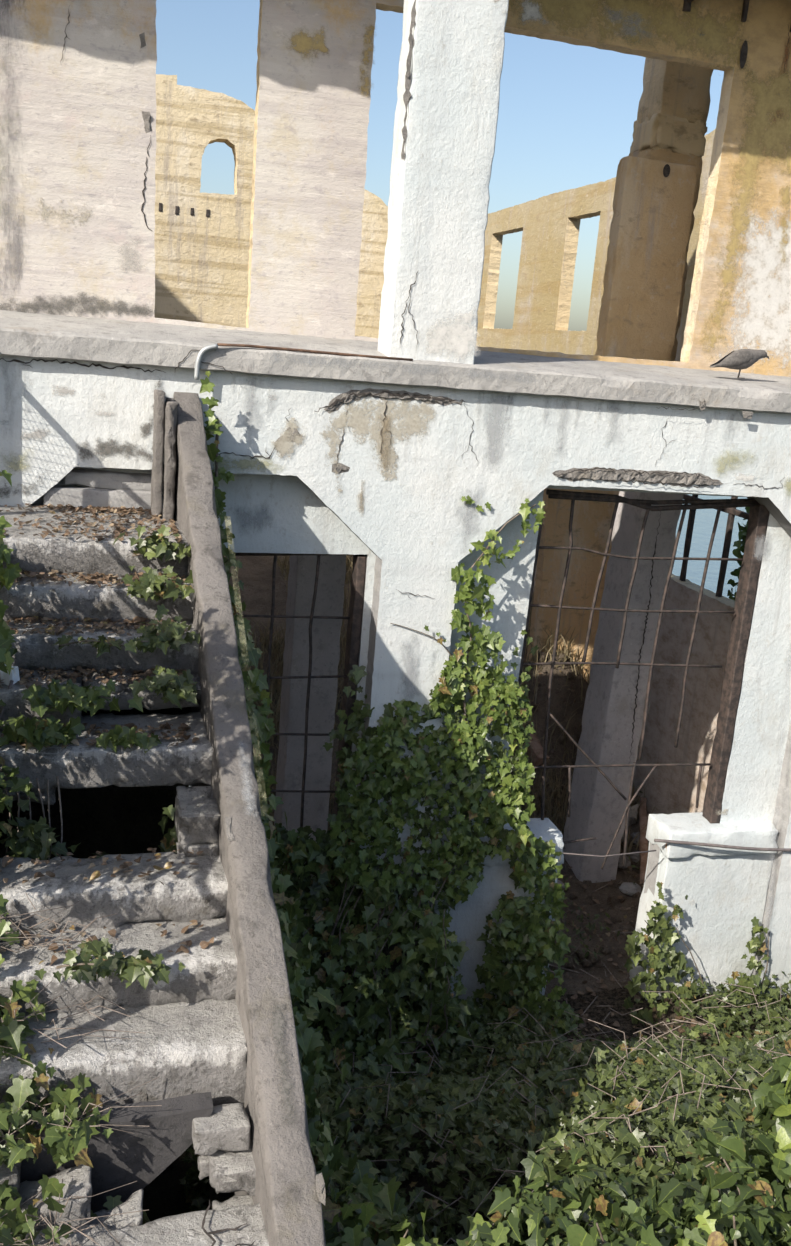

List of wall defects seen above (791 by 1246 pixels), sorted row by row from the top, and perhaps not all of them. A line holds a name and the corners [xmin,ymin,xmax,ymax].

crack [141,135,152,231]
crack [400,270,419,351]
leakage [725,185,791,365]
peeling [315,388,465,492]
spalling [552,467,754,488]
crack [202,1200,256,1246]